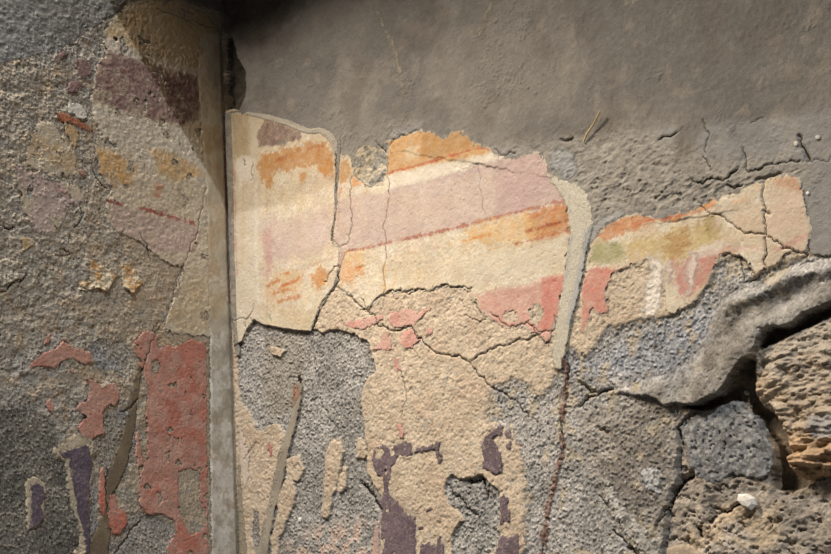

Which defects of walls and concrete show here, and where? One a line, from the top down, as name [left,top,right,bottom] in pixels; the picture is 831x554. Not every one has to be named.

peeling [15,58,93,250]
peeling [78,260,143,294]
spalling [351,144,388,187]
crack [312,130,613,417]
crack [692,121,831,283]
peeling [0,329,209,554]
spalling [237,254,831,554]